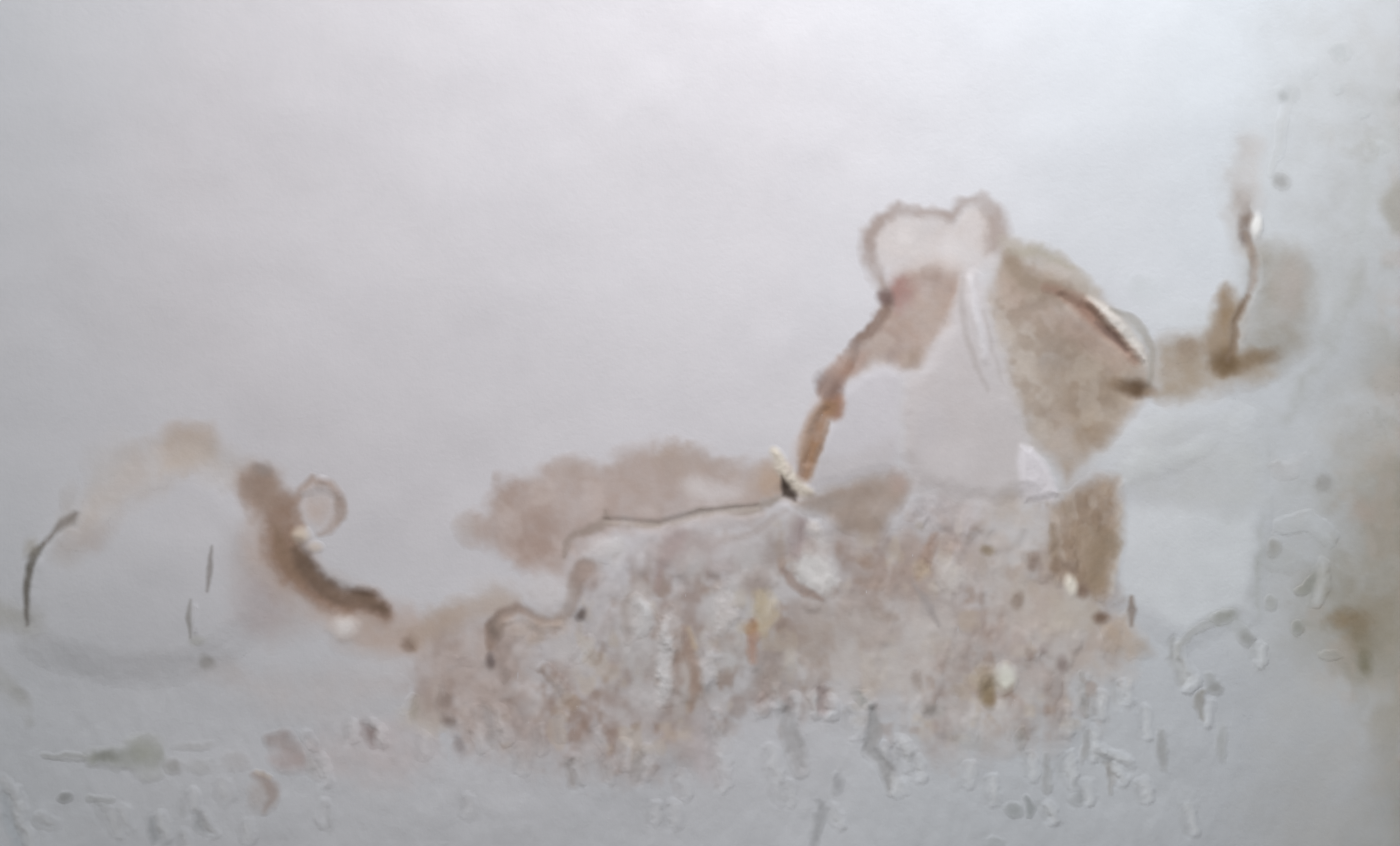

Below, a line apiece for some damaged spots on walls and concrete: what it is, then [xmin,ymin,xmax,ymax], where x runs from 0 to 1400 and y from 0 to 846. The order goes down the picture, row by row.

leakage [1122,0,1400,846]
crack [22,420,136,626]
peeling [162,725,337,836]
peeling [340,692,420,750]
leakage [190,432,1145,804]
peeling [753,678,930,846]
spalling [968,660,1019,712]